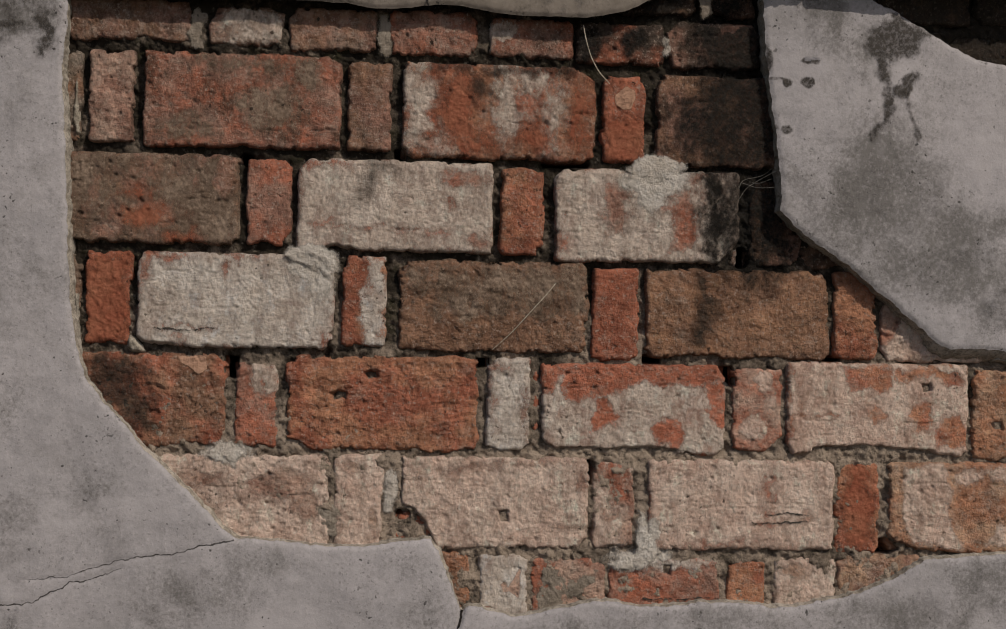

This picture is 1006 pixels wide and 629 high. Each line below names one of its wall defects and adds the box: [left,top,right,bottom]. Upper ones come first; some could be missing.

water stain [864,13,931,141]
peeling [296,62,494,347]
peeling [553,87,740,265]
peeling [754,0,1006,457]
peeling [136,251,335,350]
peeling [484,357,531,451]
peeling [161,453,331,544]
peeling [333,453,385,544]
peeling [401,455,590,549]
peeling [540,375,835,551]
peeling [903,463,962,550]
crack [0,539,234,606]